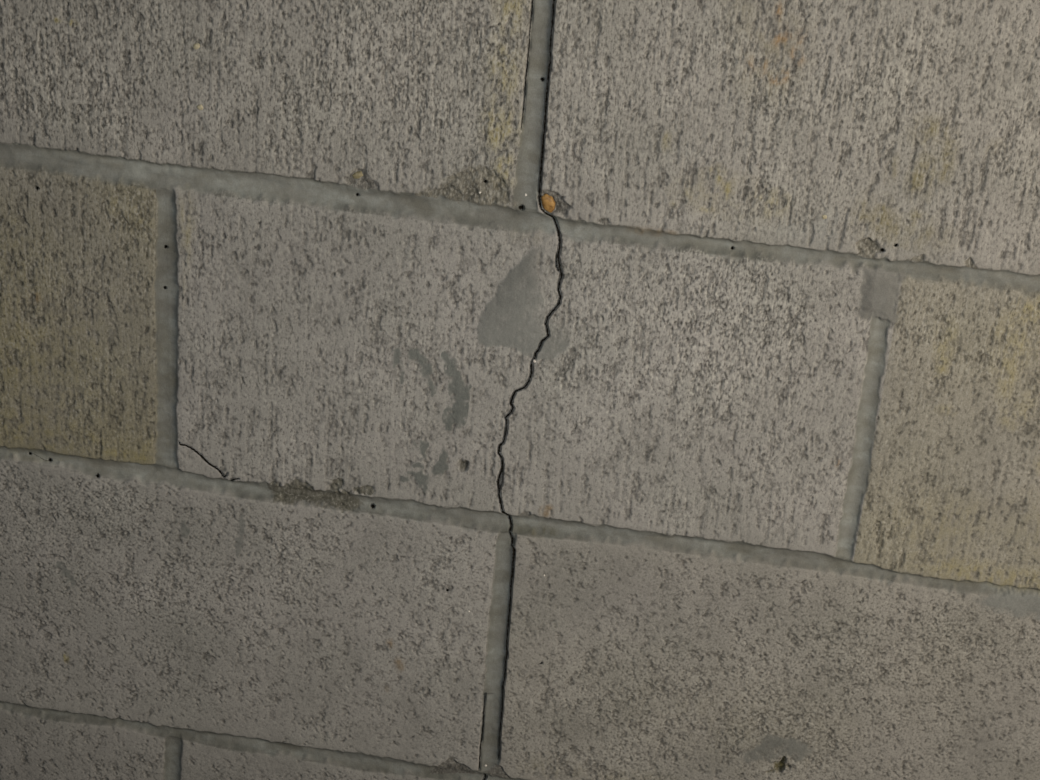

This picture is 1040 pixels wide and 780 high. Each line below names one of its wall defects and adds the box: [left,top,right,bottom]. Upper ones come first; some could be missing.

crack [479,0,562,780]